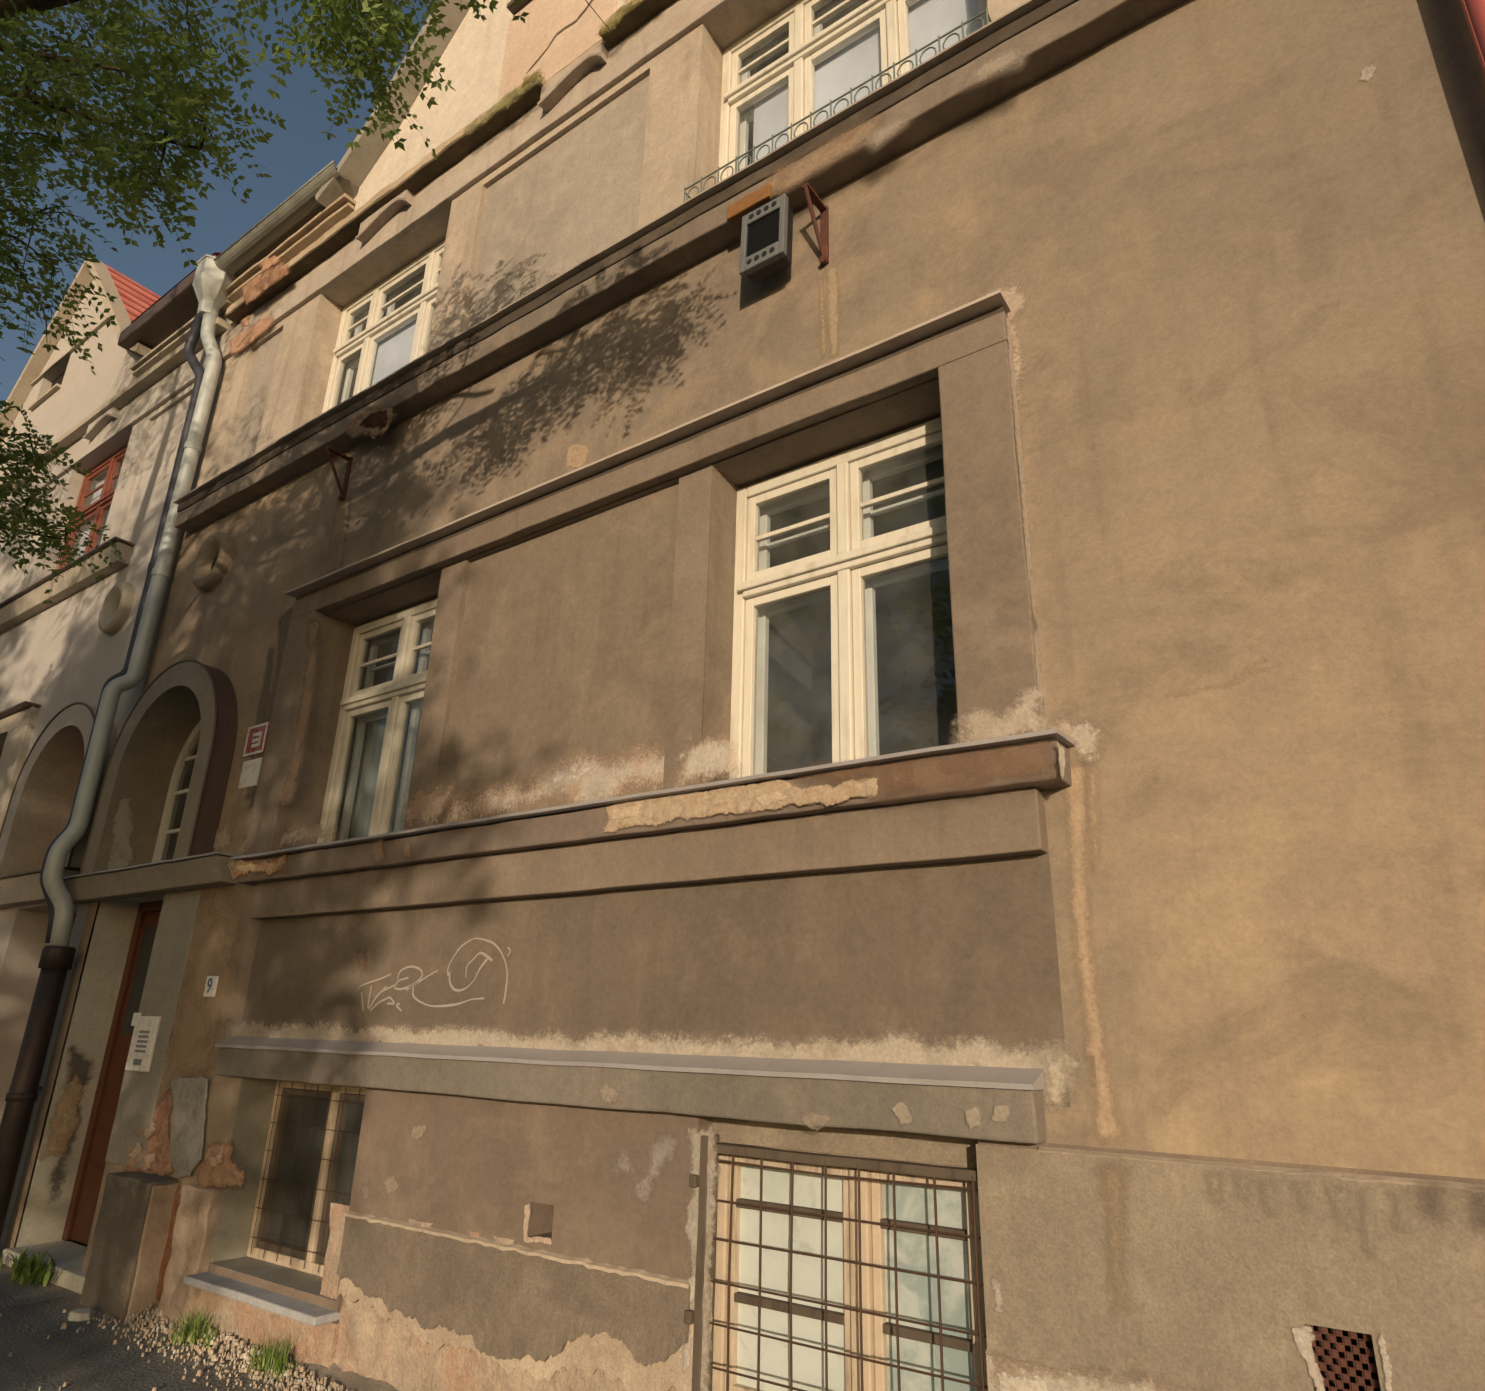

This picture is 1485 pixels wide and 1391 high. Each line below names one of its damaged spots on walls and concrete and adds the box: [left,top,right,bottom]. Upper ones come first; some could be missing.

spalling [229,255,289,354]
spalling [344,405,397,439]
spalling [604,777,878,833]
spalling [39,1047,91,1198]
spalling [122,1091,180,1301]
spalling [197,1142,245,1190]
spalling [336,1124,719,1391]
peeling [993,1355,1166,1391]
peeling [1292,1325,1325,1391]
peeling [1378,1333,1392,1391]